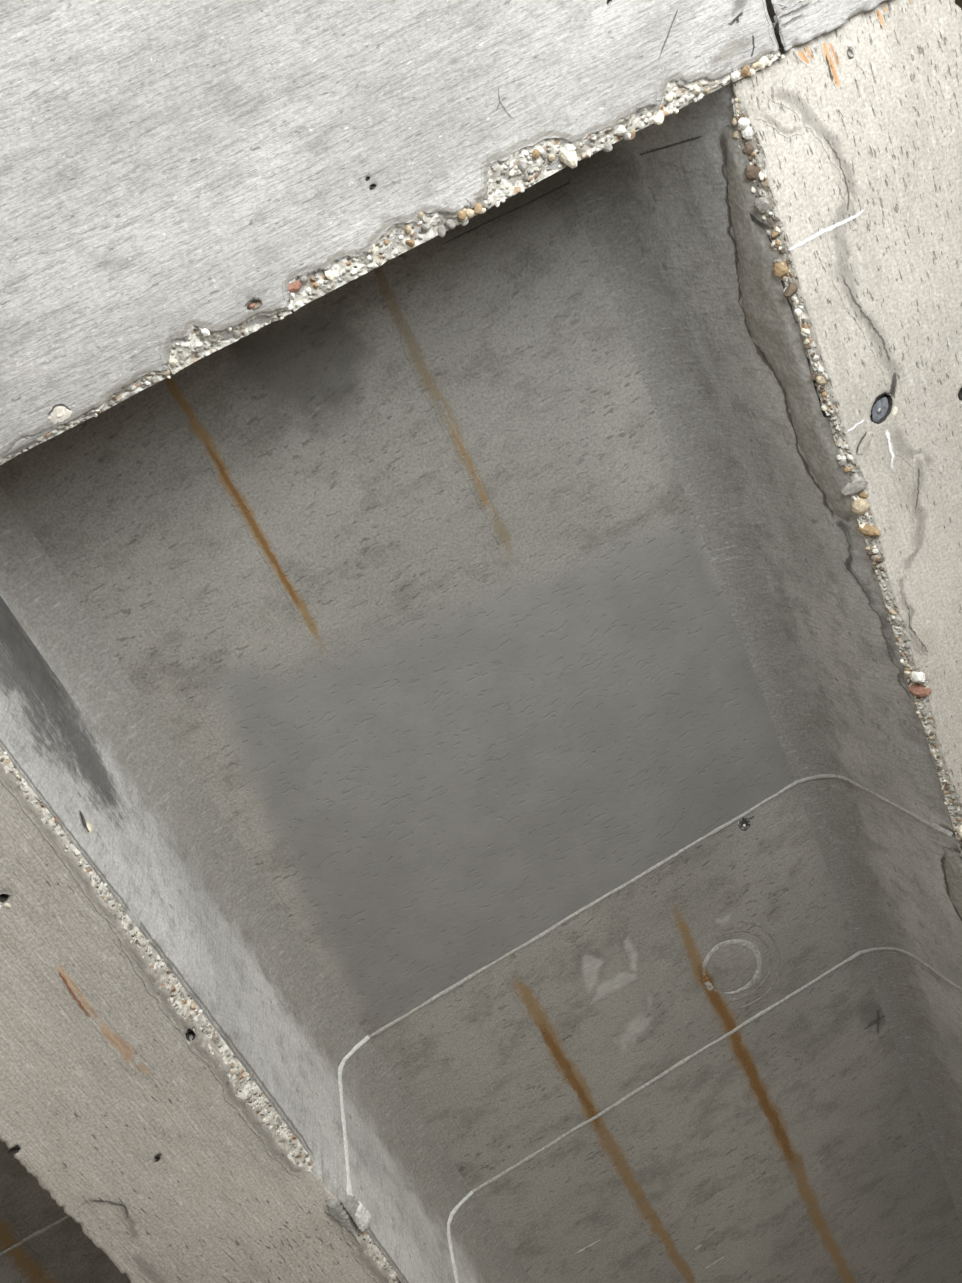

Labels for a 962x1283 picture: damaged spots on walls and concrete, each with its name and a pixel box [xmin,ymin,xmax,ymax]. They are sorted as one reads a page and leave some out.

crack [445,182,570,243]
crack [751,0,905,386]
rust [162,373,334,658]
rust [372,264,524,574]
spalling [0,44,962,857]
crack [640,136,937,697]
leakage [0,596,115,806]
spalling [0,739,315,1179]
spalling [342,1227,408,1283]
rust [499,962,698,1283]
peeling [578,932,642,1006]
rust [662,889,859,1283]